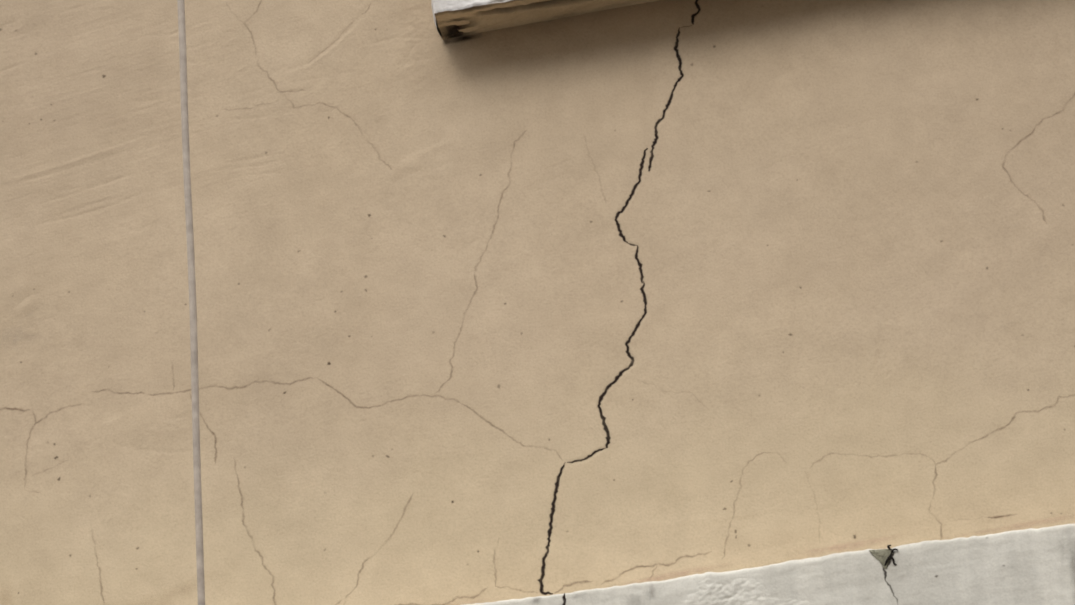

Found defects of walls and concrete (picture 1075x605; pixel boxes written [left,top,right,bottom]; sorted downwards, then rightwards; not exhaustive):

crack [538,0,701,605]